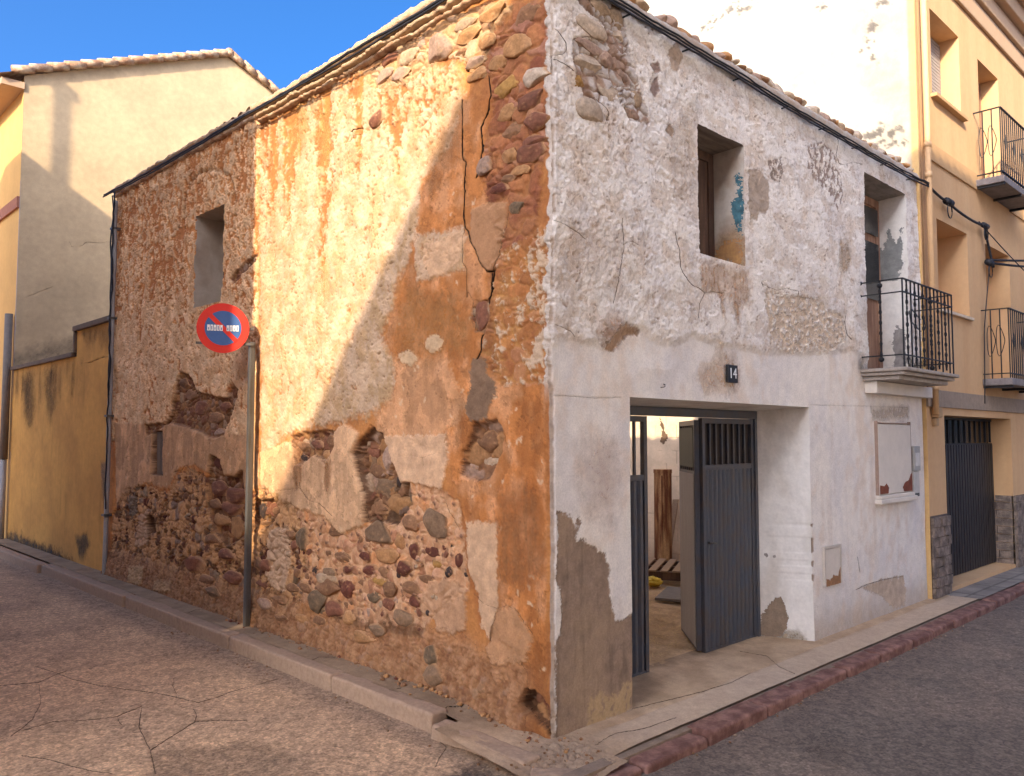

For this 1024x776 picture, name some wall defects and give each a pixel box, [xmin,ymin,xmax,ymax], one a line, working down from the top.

flaking render [572,0,683,125]
flaking render [362,0,552,280]
crack [461,57,509,359]
peeling [731,157,783,236]
peeling [805,142,843,210]
crack [675,232,719,318]
spalling [605,323,639,352]
spalling [146,372,239,438]
flaking render [183,427,633,738]
peeling [761,596,789,637]